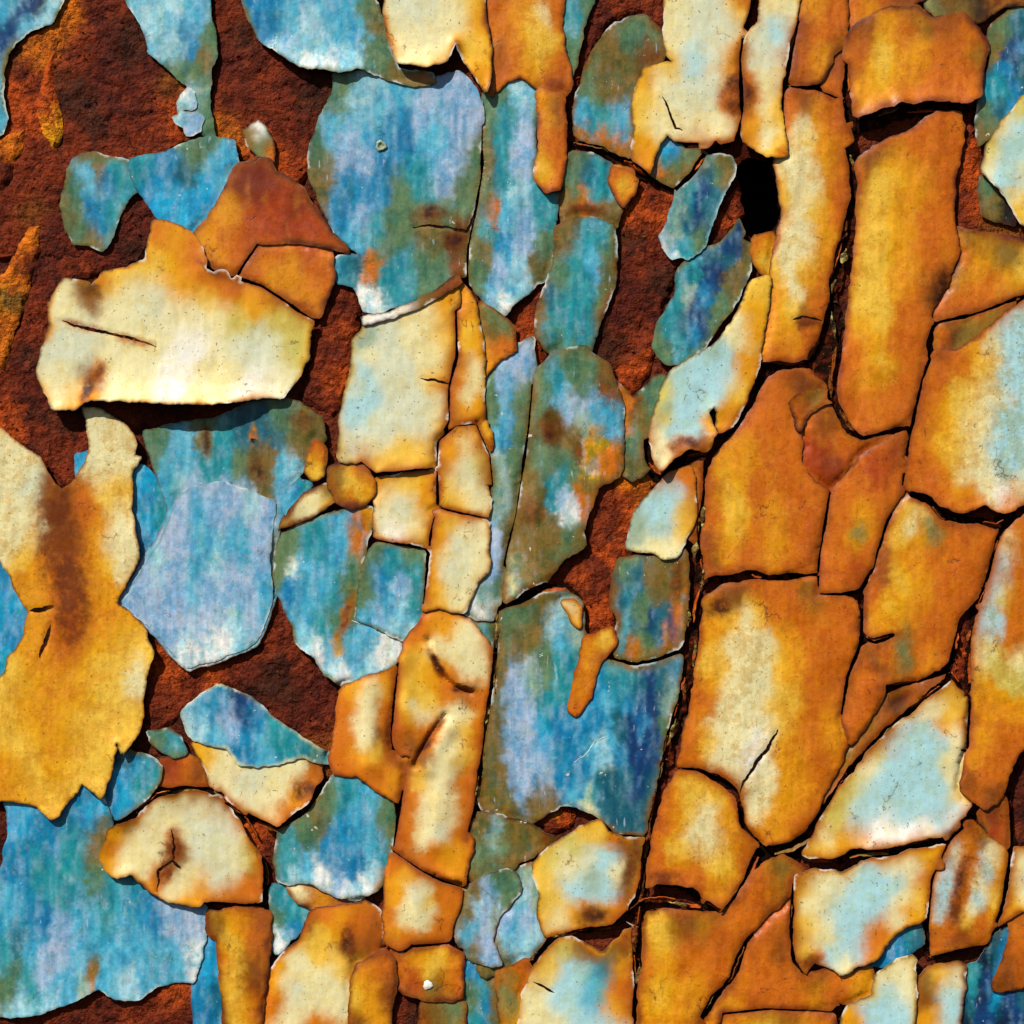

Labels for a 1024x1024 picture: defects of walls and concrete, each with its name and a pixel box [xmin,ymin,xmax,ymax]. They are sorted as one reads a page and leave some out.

corrosion [0,0,187,645]
crack [62,320,156,347]
crack [156,830,181,888]
peeling [0,0,398,1024]
corrosion [143,597,339,751]
corrosion [210,0,333,184]
corrosion [302,282,362,419]
peeling [454,457,706,1024]
peeling [241,0,1024,686]
corrosion [592,180,685,395]
crack [530,0,1024,1020]
peeling [636,110,1024,1024]